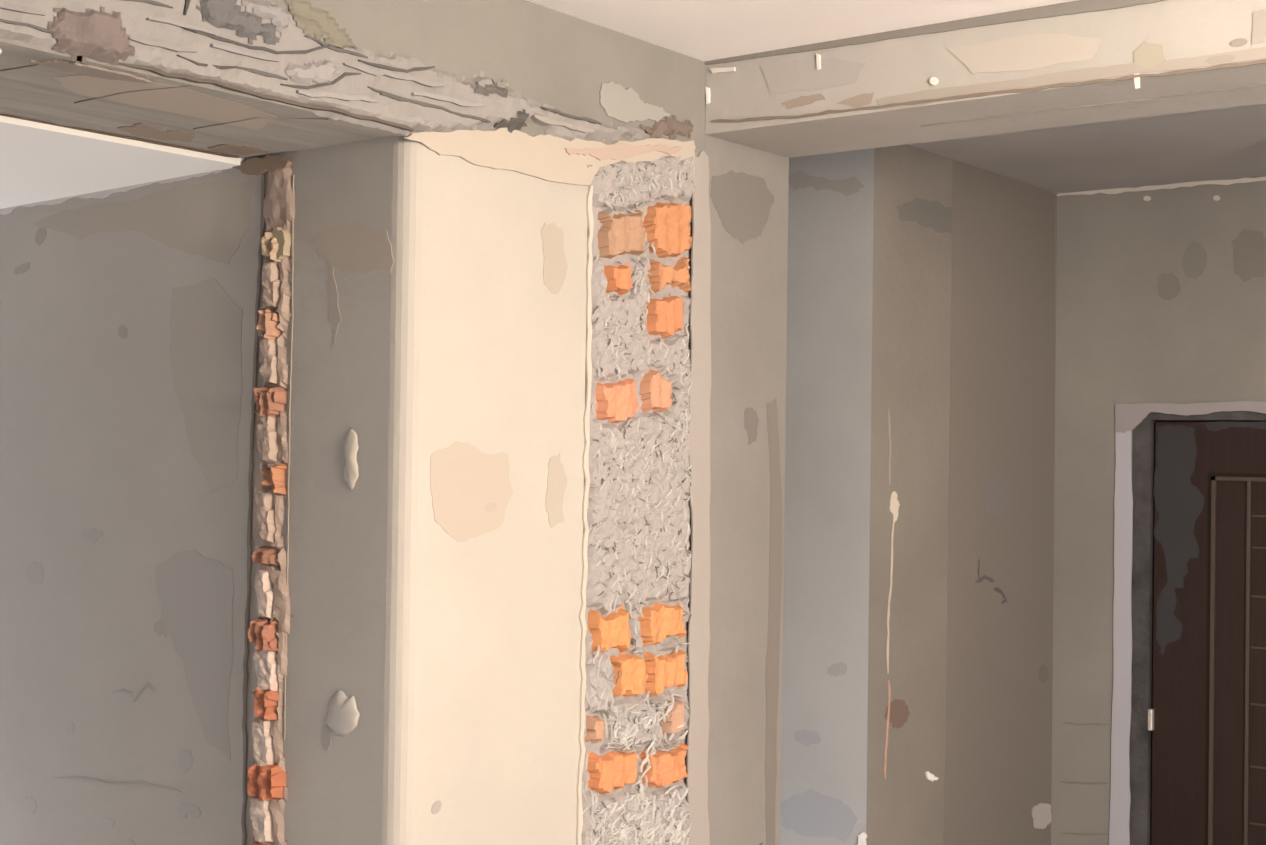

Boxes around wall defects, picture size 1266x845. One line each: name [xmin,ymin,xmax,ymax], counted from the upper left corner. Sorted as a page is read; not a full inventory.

crack [0,19,55,34]
crack [119,0,491,132]
spalling [0,0,669,142]
flaking render [261,232,282,262]
flaking render [256,308,282,340]
flaking render [254,386,287,418]
flaking render [260,463,287,495]
spalling [581,156,697,845]
flaking render [251,548,280,567]
flaking render [248,617,279,652]
flaking render [250,687,280,720]
flaking render [247,763,287,801]